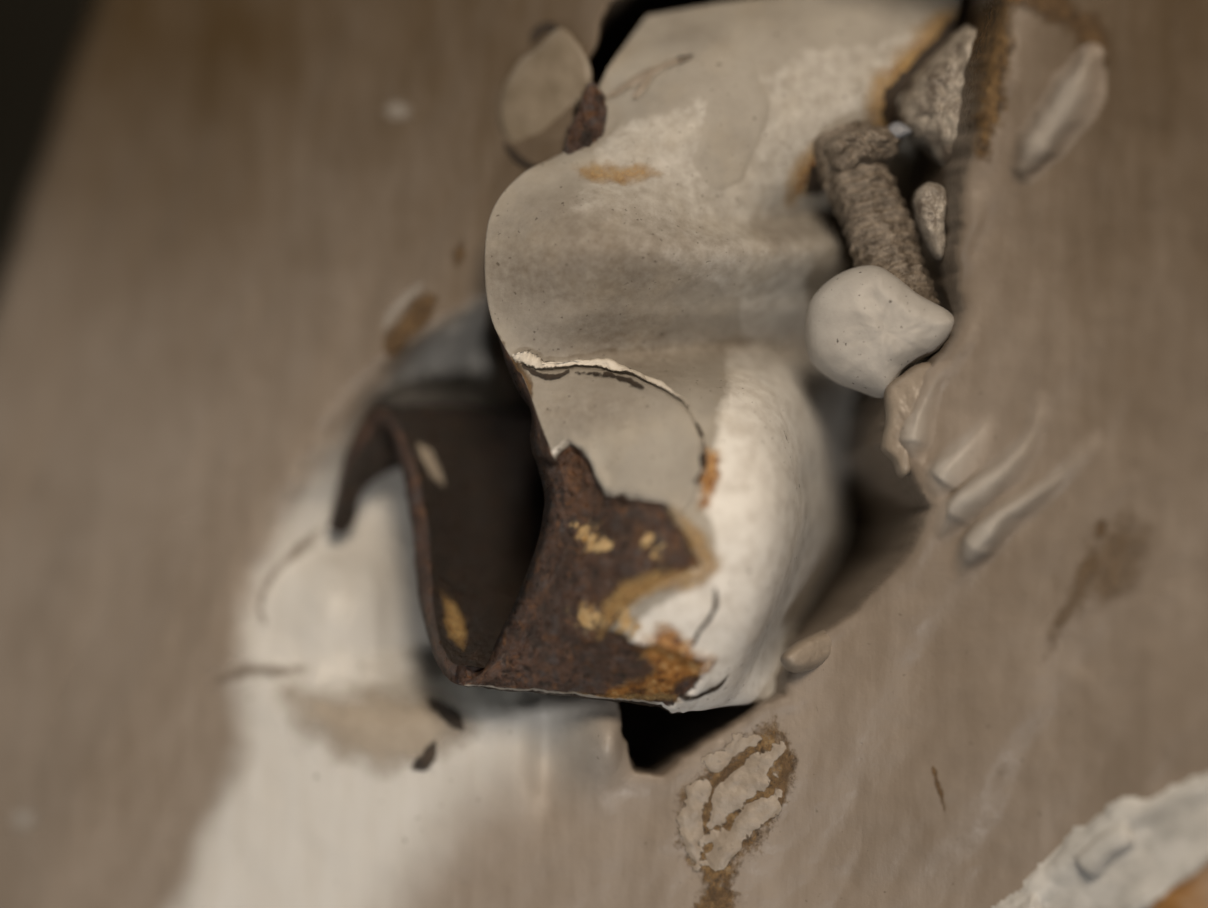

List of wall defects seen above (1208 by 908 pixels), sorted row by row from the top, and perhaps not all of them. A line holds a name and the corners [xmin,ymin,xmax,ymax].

peeling [499,22,608,169]
peeling [512,351,689,406]
peeling [694,423,706,483]
rust [446,602,464,639]
rust [468,445,720,706]
peeling [676,723,797,908]
peeling [991,773,1208,908]